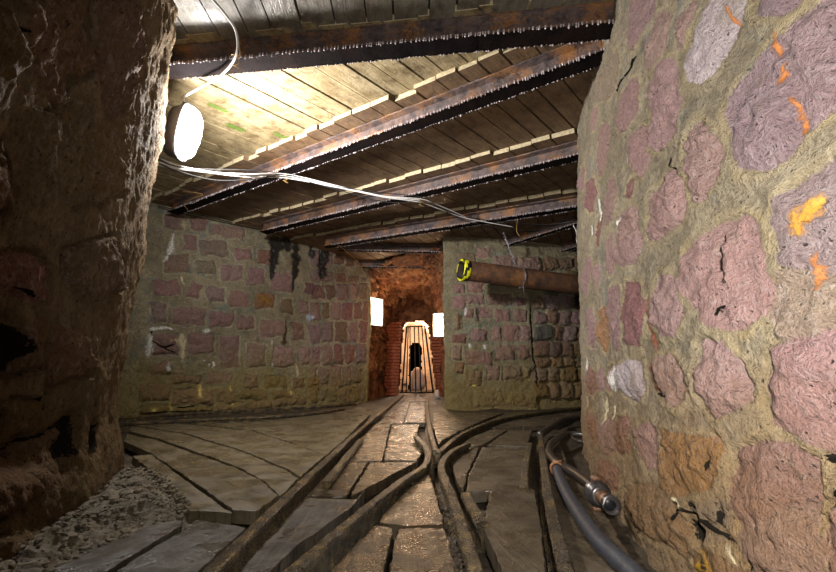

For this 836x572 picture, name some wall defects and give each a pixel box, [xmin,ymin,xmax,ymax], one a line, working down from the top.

crack [616,56,637,93]
damp [267,234,330,293]